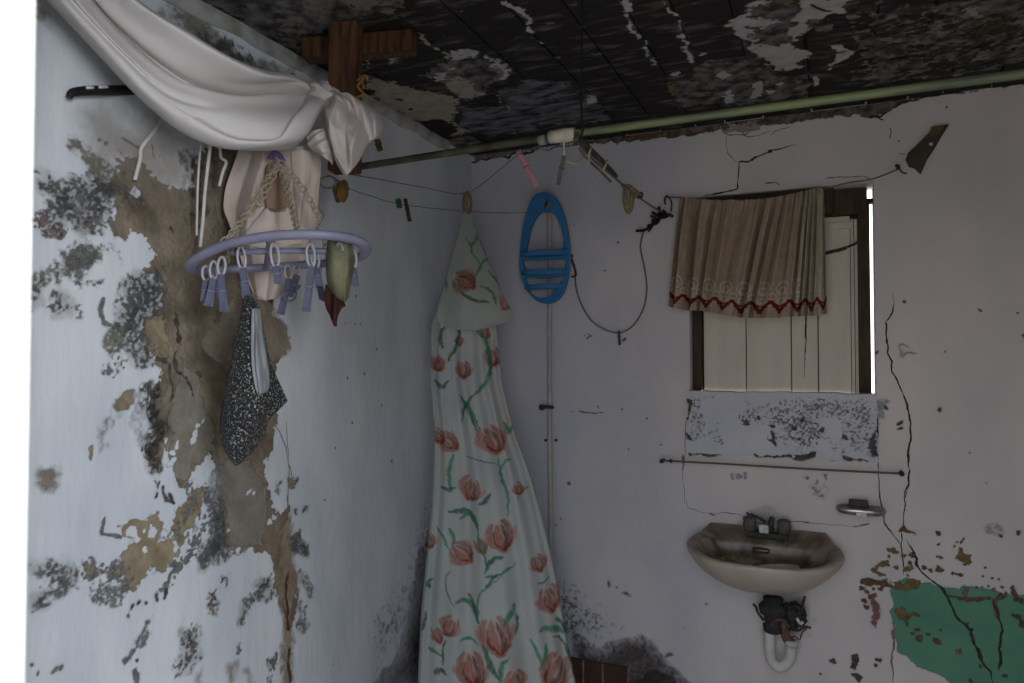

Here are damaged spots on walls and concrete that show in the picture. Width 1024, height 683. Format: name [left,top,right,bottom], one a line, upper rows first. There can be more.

peeling [362,32,925,162]
peeling [664,0,1024,110]
crack [703,127,795,196]
water stain [30,125,179,318]
water stain [98,271,165,378]
flaking render [81,146,300,628]
crack [682,419,761,524]
peeling [739,399,879,462]
crack [791,299,1004,683]
peeling [859,531,1024,628]
water stain [380,591,423,683]
water stain [561,590,686,683]